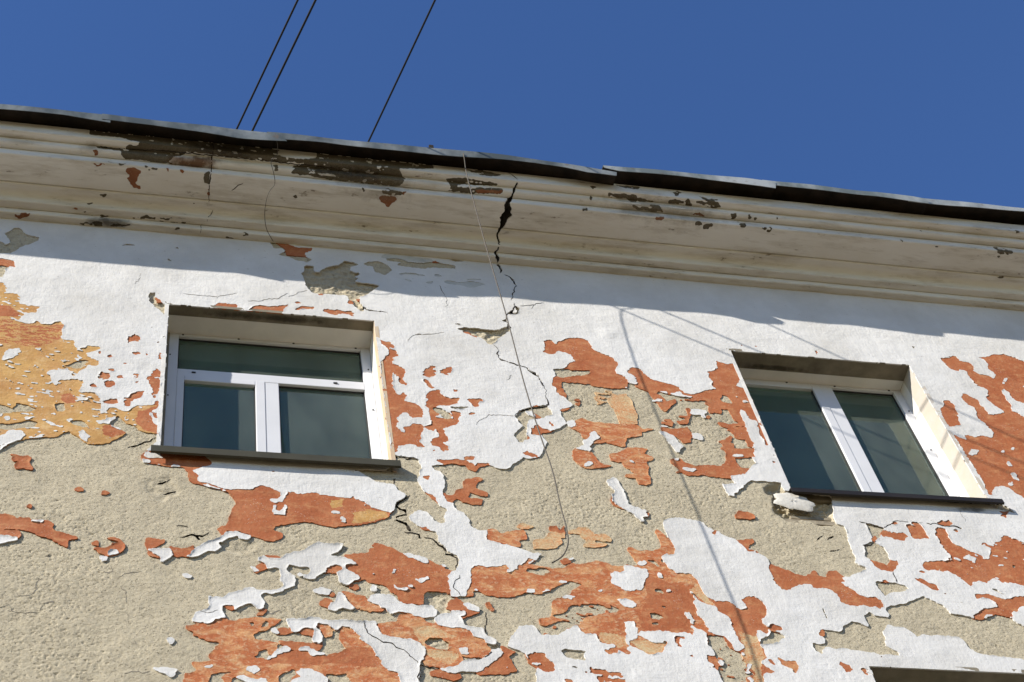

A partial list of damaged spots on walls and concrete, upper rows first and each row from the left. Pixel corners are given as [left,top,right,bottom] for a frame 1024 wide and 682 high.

peeling [73,193,186,230]
crack [98,142,334,233]
spalling [89,130,434,207]
peeling [608,185,721,229]
crack [485,172,549,418]
flaking render [0,212,1024,682]
crack [393,455,461,596]